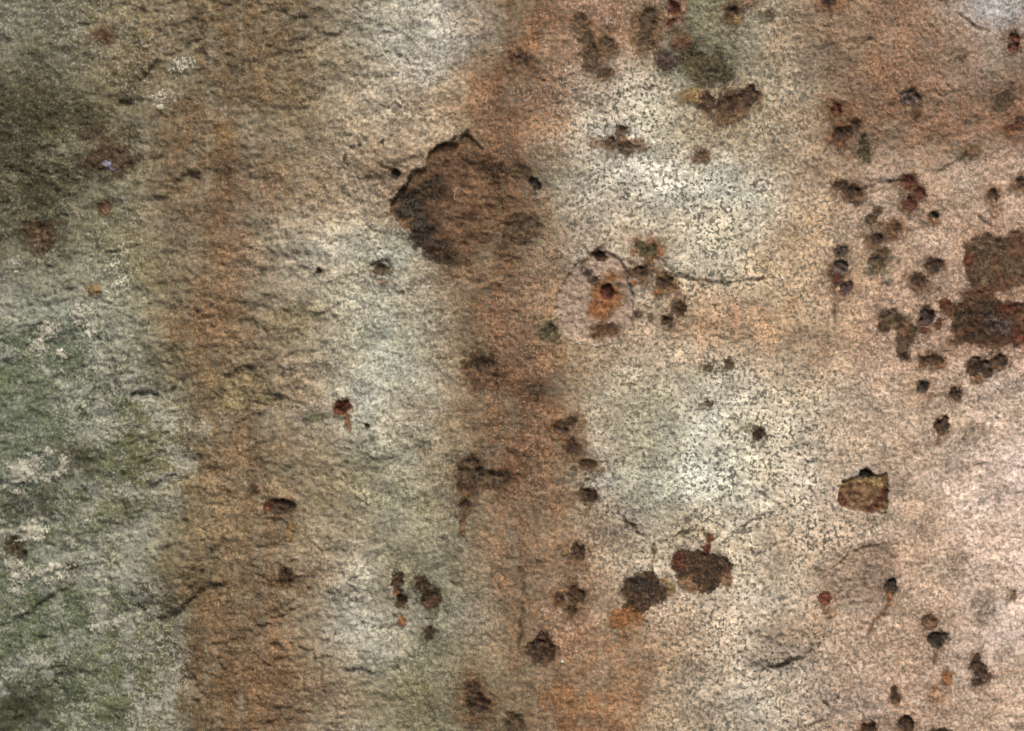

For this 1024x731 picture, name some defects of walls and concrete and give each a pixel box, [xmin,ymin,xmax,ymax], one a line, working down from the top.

spalling [388,129,542,281]
rust [302,395,365,431]
spalling [608,528,734,629]
spalling [815,469,904,606]